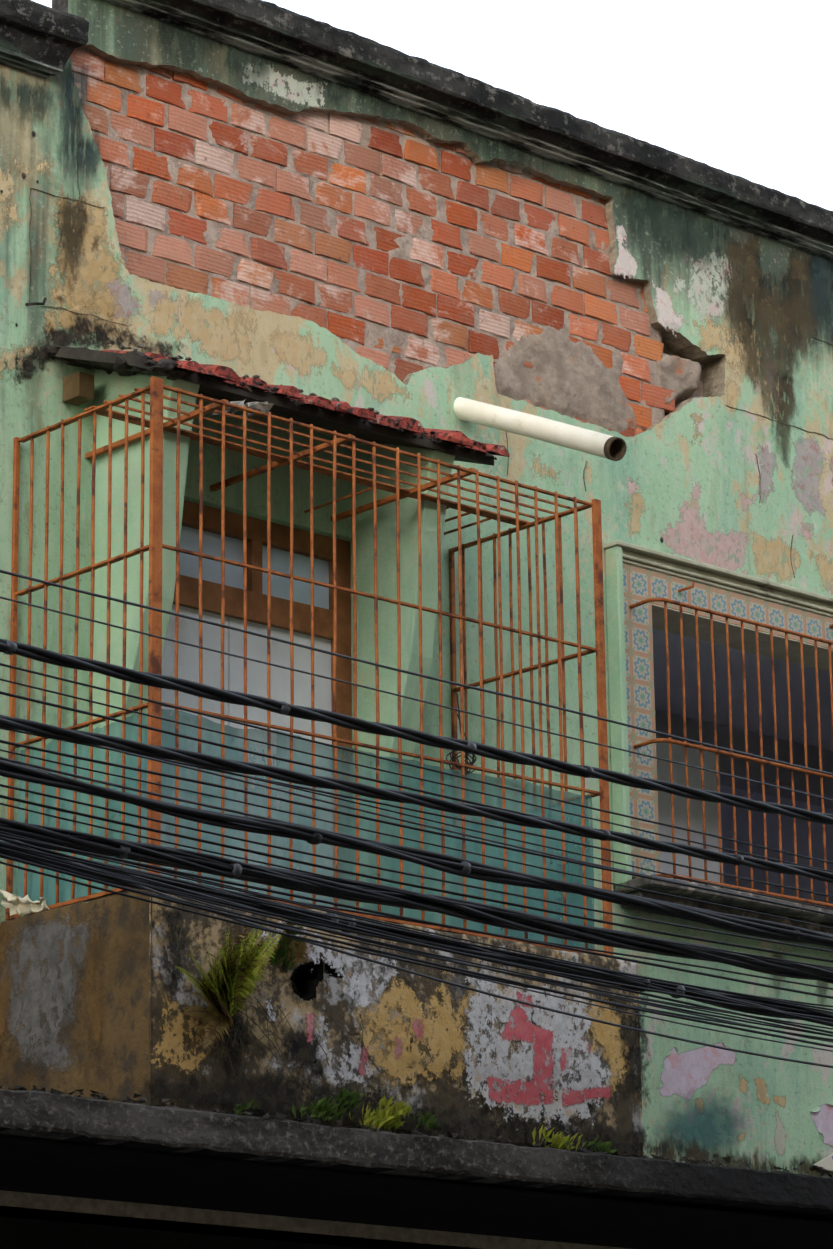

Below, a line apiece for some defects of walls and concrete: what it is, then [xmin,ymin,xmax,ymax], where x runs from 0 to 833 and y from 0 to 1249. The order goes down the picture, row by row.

leakage [0,65,100,178]
peeling [0,158,53,231]
leakage [58,198,87,278]
flaking render [44,47,760,446]
peeling [0,343,40,379]
leakage [623,188,833,459]
crack [726,405,832,439]
peeling [660,436,833,596]
peeling [259,921,474,1089]
peeling [584,994,631,1093]
peeling [659,1043,786,1110]
peeling [811,1103,833,1147]